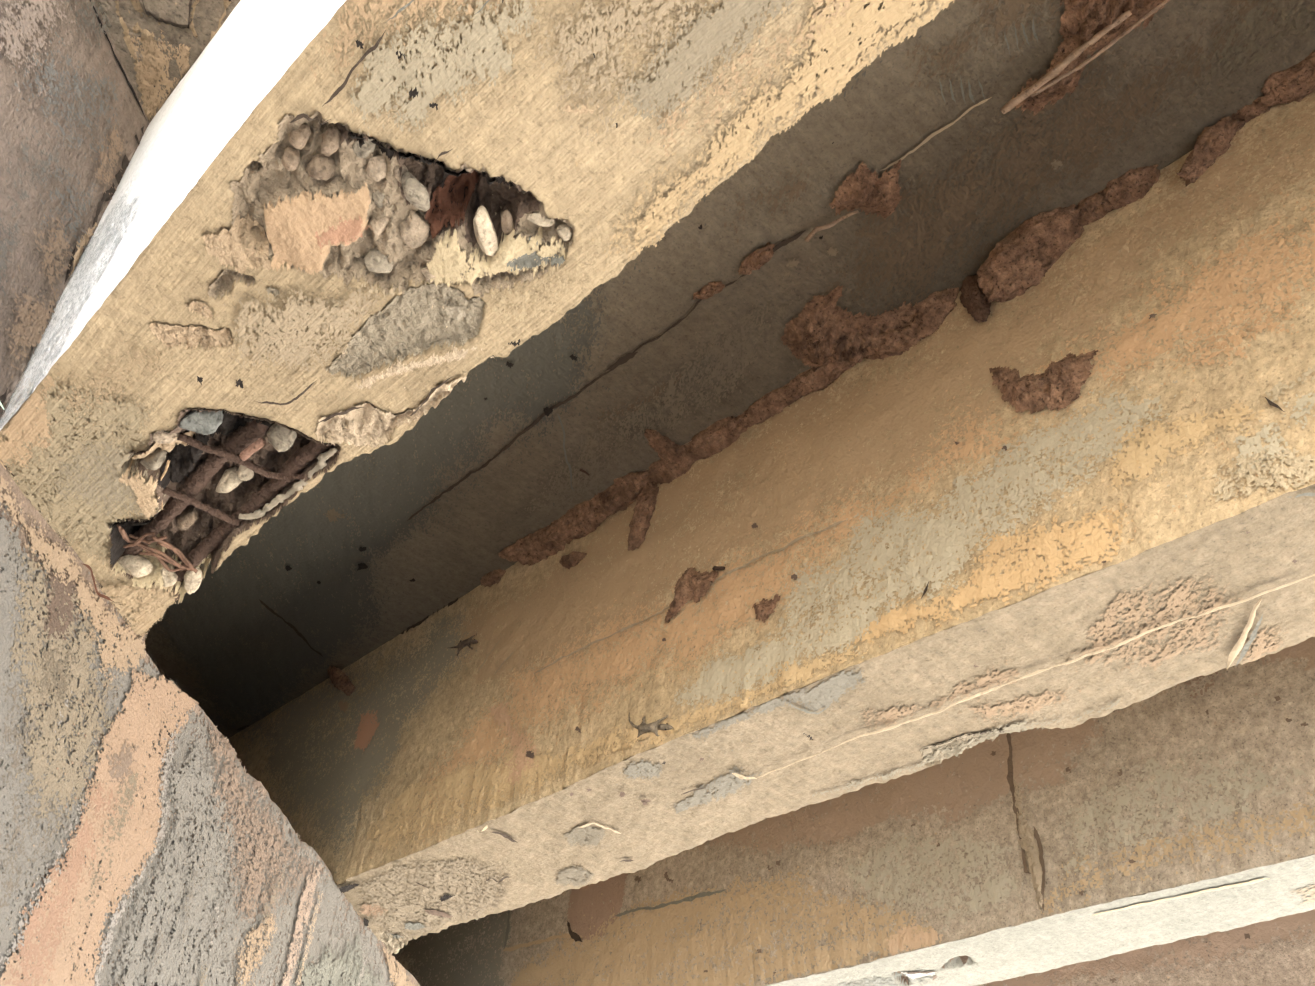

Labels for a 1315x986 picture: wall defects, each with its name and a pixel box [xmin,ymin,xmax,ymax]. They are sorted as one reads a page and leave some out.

spalling [106,111,575,604]
crack [407,274,747,521]
crack [773,230,806,252]
crack [923,731,1045,911]